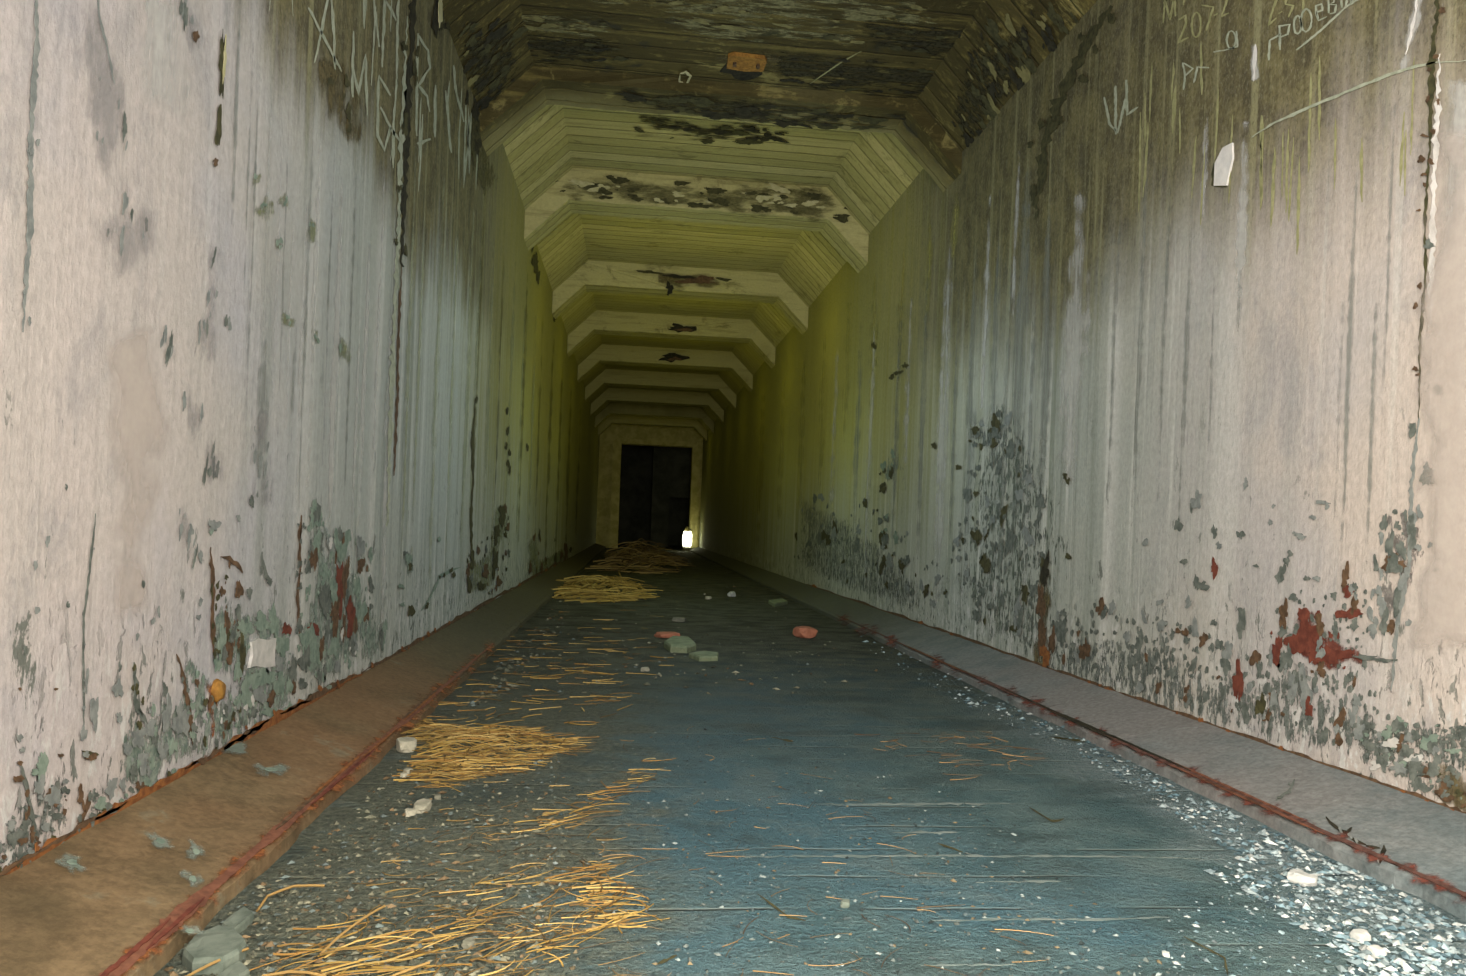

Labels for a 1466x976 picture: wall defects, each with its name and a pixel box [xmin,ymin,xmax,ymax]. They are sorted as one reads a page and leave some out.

damp [234,33,250,146]
corrosion [318,57,362,142]
peeling [591,0,937,44]
damp [1405,0,1418,54]
damp [894,240,1090,556]
damp [1344,278,1352,500]
peeling [0,734,71,876]
peeling [123,499,388,793]
corrosion [0,561,561,876]
peeling [466,504,572,595]
peeling [794,406,1466,798]
corrosion [807,550,1466,901]